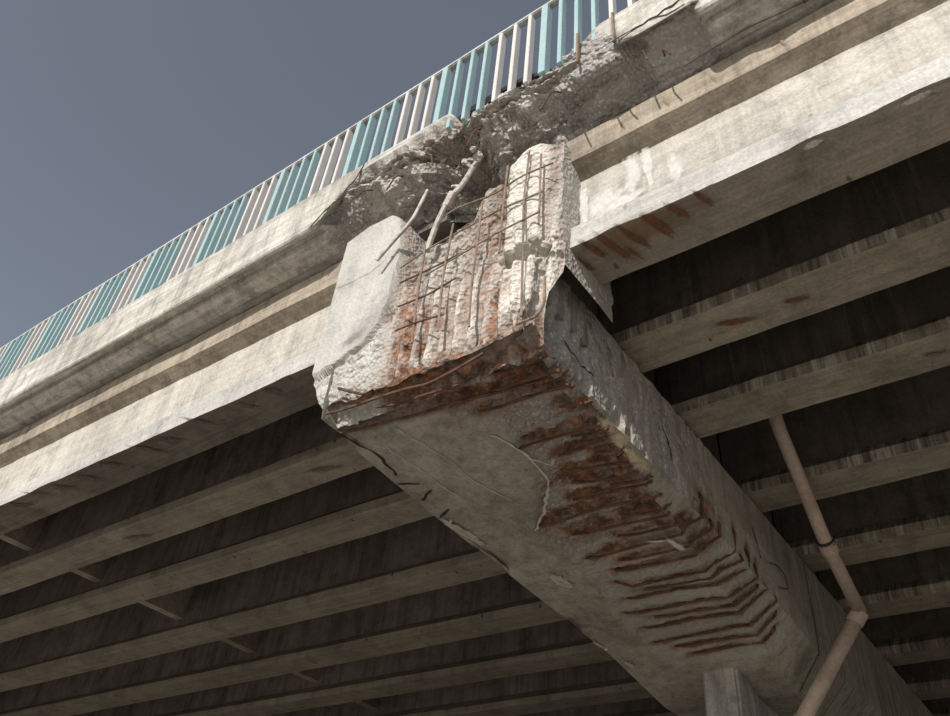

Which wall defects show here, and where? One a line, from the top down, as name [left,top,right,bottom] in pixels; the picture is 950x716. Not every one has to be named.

crack [596,0,683,52]
crack [684,0,809,67]
rust [692,191,713,206]
rust [579,203,690,259]
spalling [314,3,792,665]